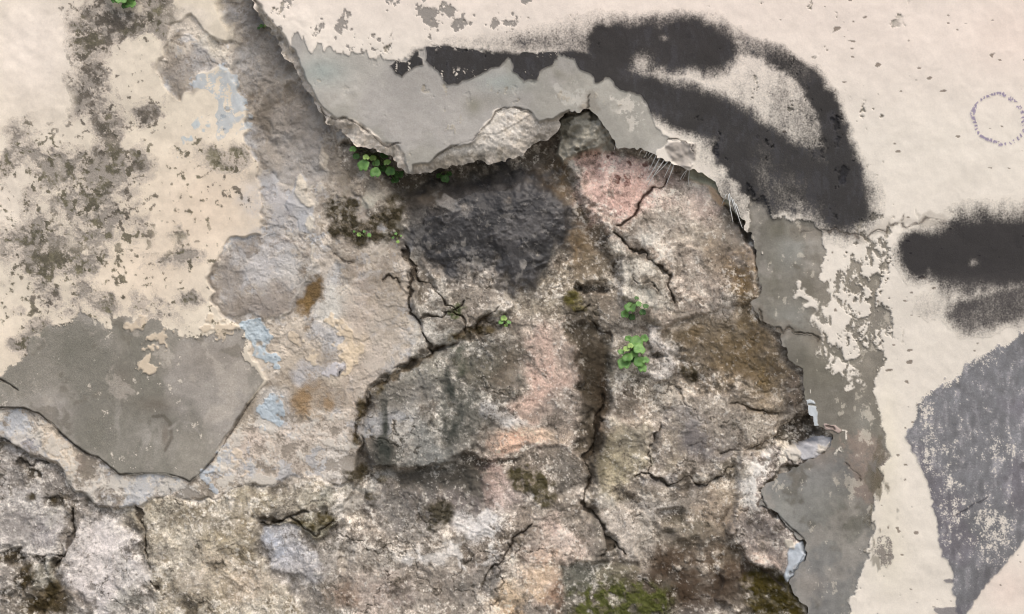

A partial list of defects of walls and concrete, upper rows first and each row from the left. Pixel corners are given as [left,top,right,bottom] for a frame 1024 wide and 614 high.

peeling [156,0,671,175]
leakage [0,0,586,358]
crack [613,178,676,303]
crack [354,245,505,446]
spalling [0,148,893,614]
crack [575,305,613,342]
crack [580,394,626,557]
crack [634,423,760,487]
crack [731,402,779,415]
crack [484,523,533,581]
crack [723,513,786,589]